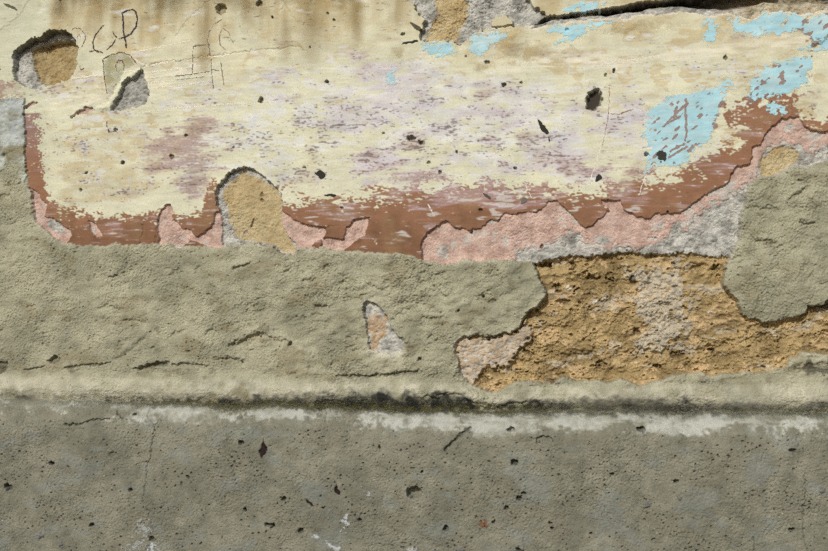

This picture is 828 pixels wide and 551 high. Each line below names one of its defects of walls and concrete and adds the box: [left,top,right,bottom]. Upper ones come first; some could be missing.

spalling [14,31,79,90]
spalling [71,67,150,119]
peeling [28,183,75,244]
peeling [87,218,104,241]
spalling [154,167,372,255]
spalling [409,0,828,392]
spalling [364,301,404,354]